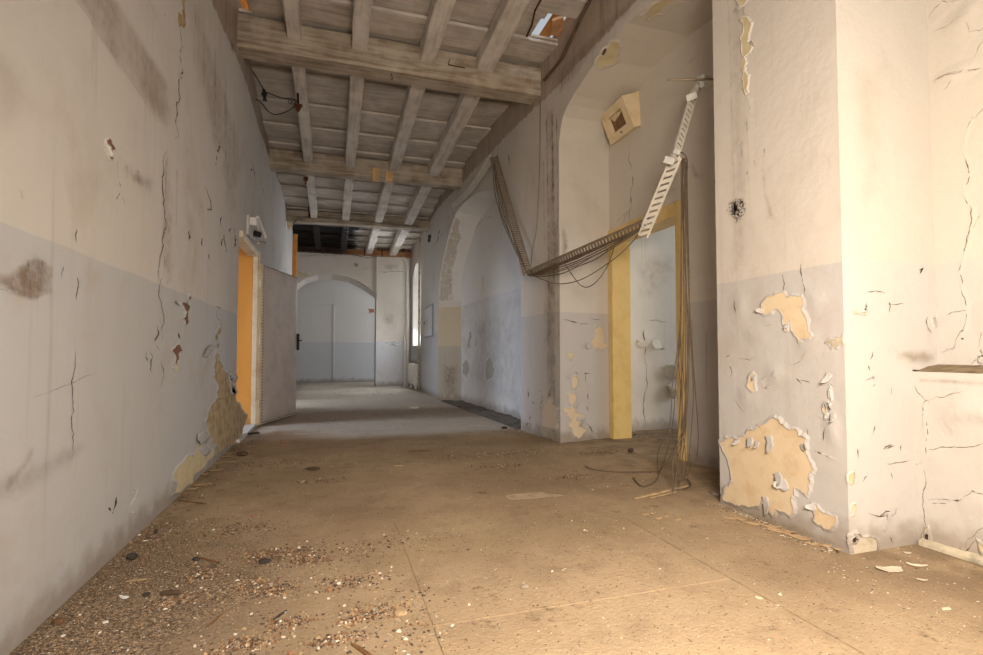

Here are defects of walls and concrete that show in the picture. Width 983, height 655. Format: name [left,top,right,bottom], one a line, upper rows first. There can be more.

peeling [735,0,755,95]
crack [931,0,983,90]
crack [79,4,191,386]
crack [926,106,983,365]
peeling [755,290,814,344]
crack [34,351,89,456]
peeling [174,445,214,494]
peeling [561,374,598,441]
peeling [717,414,881,555]
peeling [821,373,836,422]
crack [869,510,896,543]
crack [867,353,983,526]